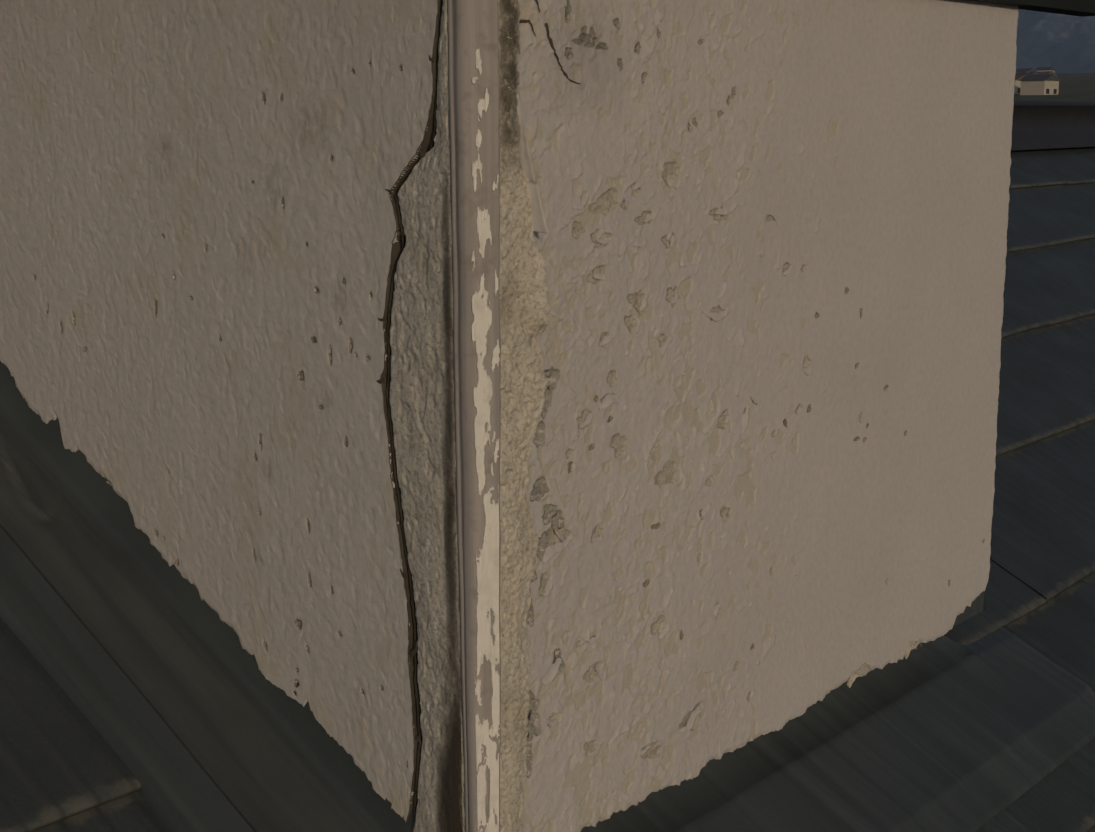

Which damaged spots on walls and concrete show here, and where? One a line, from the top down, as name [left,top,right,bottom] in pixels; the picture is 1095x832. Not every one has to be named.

crack [519,0,580,84]
peeling [565,26,608,60]
peeling [568,174,660,257]
crack [377,0,443,830]
spalling [471,0,576,832]